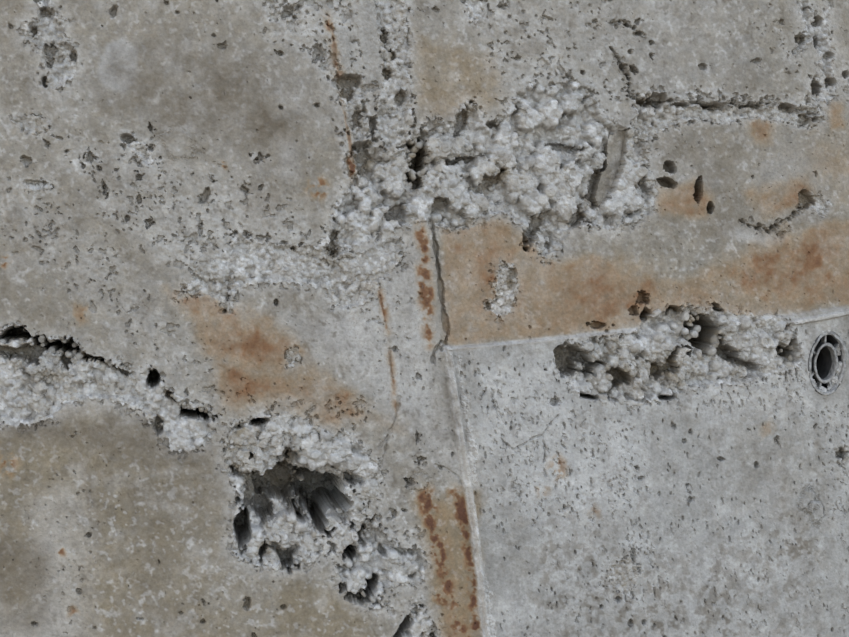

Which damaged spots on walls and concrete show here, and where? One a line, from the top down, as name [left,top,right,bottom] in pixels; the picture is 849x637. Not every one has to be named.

crack [608,18,821,119]
crack [427,222,452,365]
corrosion [412,173,849,353]
crack [434,463,466,489]
corrosion [412,483,484,637]